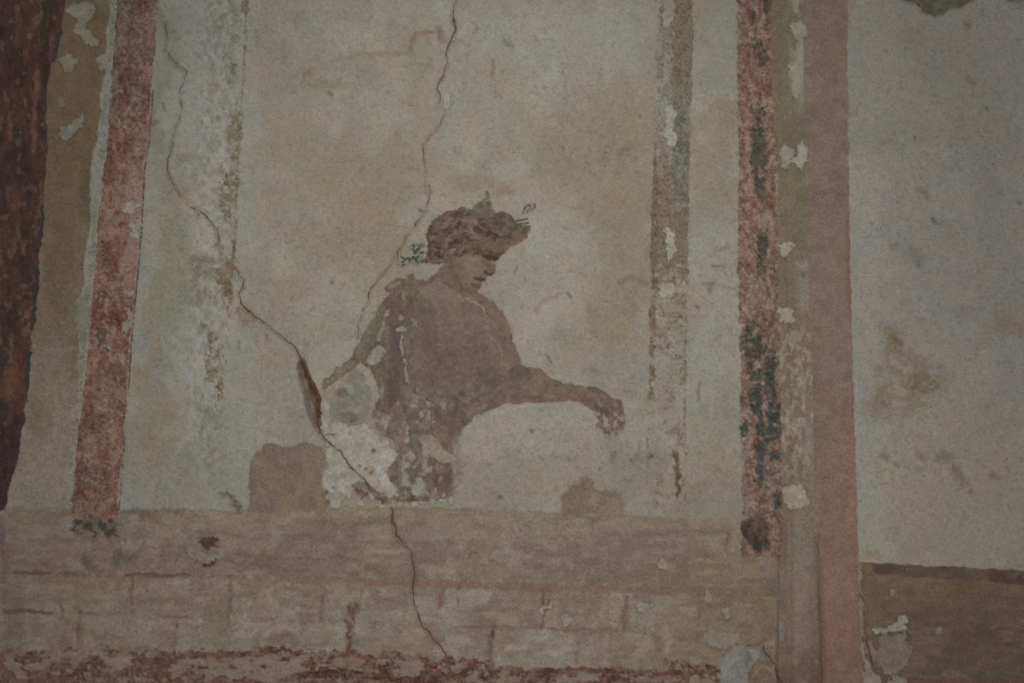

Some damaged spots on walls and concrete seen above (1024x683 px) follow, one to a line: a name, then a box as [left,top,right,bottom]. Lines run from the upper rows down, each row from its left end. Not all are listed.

flaking render [64,0,111,72]
flaking render [57,110,109,153]
flaking render [662,99,678,147]
crack [157,8,308,362]
crack [356,0,458,339]
flaking render [778,139,808,173]
flaking render [662,227,678,262]
flaking render [778,240,797,257]
flaking render [777,306,797,324]
flaking render [296,292,457,510]
flaking render [781,484,810,511]
crack [318,429,465,683]